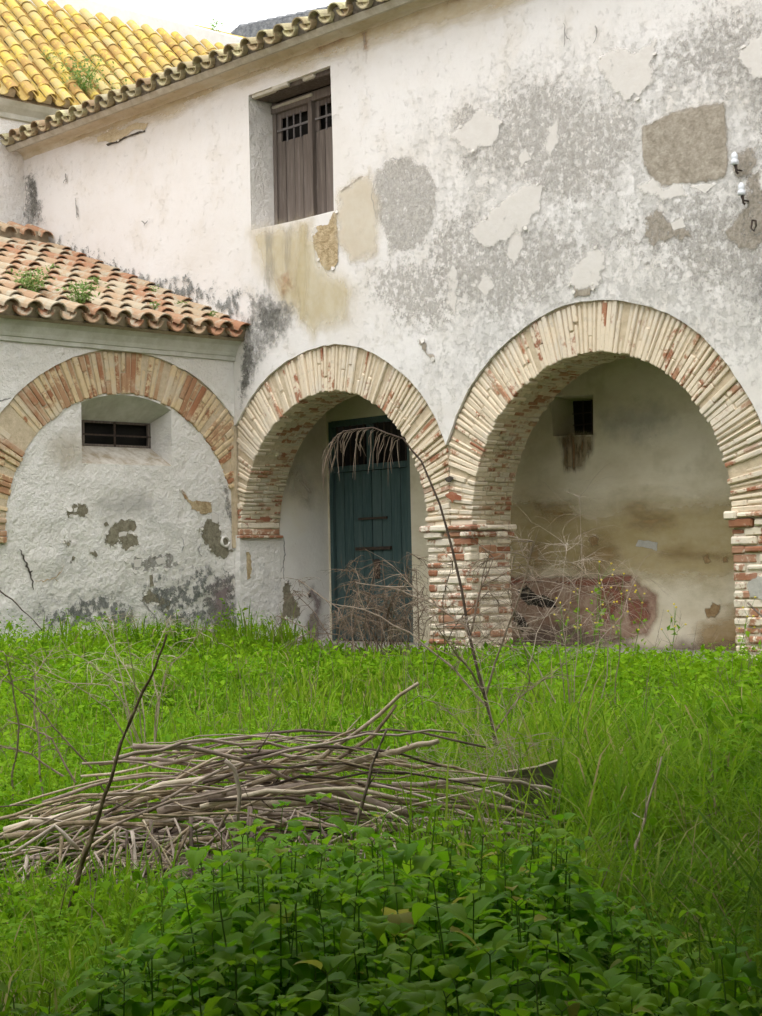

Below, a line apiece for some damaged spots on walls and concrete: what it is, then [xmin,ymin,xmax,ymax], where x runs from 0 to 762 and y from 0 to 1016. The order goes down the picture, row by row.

flaking render [376,9,762,324]
flaking render [311,210,338,270]
damp [57,227,347,394]
flaking render [66,501,89,518]
flaking render [179,489,233,559]
flaking render [104,518,180,612]
flaking render [245,549,253,580]
peeling [510,574,657,644]